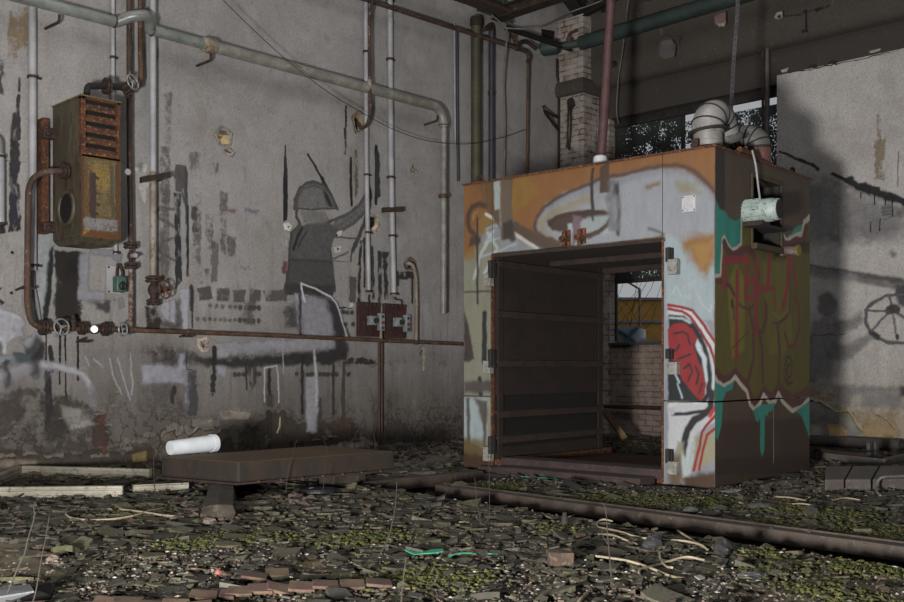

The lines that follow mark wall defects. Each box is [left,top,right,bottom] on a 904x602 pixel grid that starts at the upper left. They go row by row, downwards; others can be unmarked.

spalling [215,126,236,157]
leakage [0,331,108,455]
peeling [0,408,251,472]
leakage [212,410,359,453]
peeling [809,403,862,437]